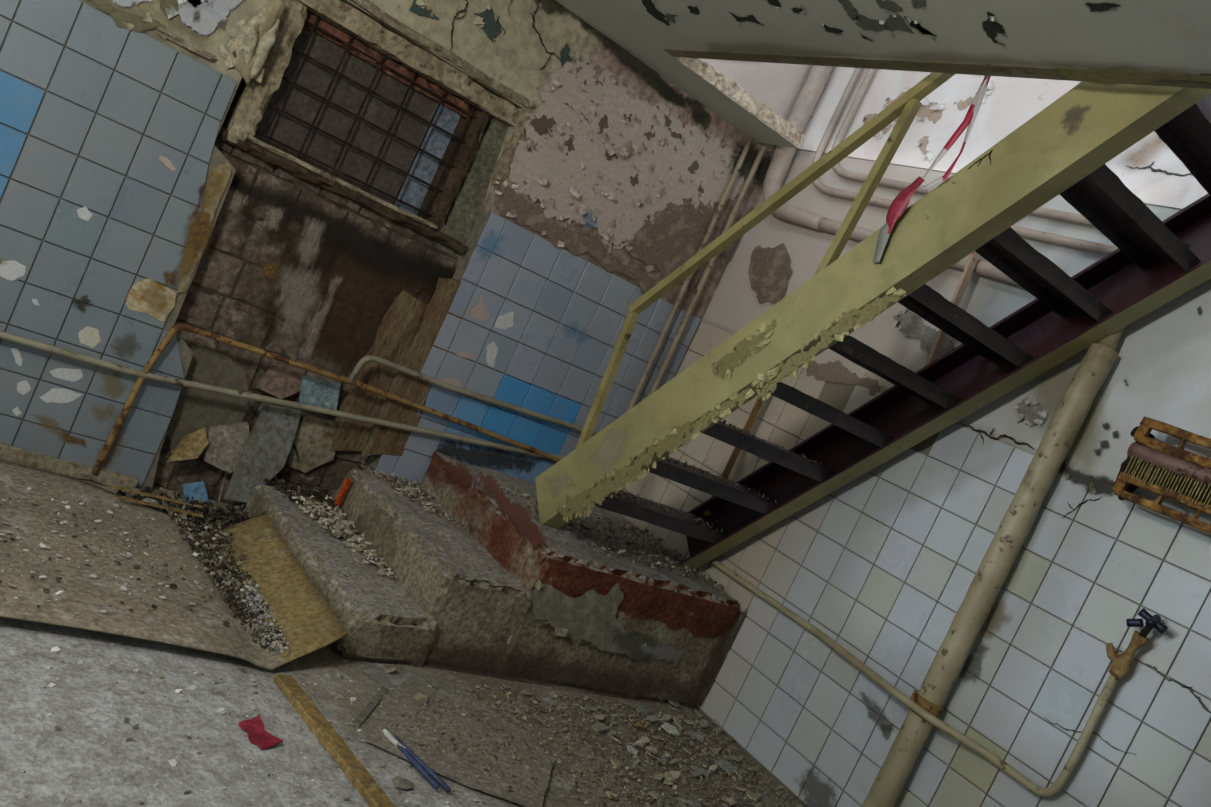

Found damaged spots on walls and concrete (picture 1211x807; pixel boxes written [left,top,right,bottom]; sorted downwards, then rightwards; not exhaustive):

peeling [90,0,242,61]
crack [450,0,468,51]
crack [508,0,563,70]
peeling [821,0,936,41]
peeling [1058,67,1211,86]
peeling [875,80,996,162]
peeling [494,43,755,294]
flaking render [164,347,255,458]
crack [959,422,1034,449]
crack [1062,496,1102,519]
spalling [531,580,681,661]
crack [1146,663,1211,713]